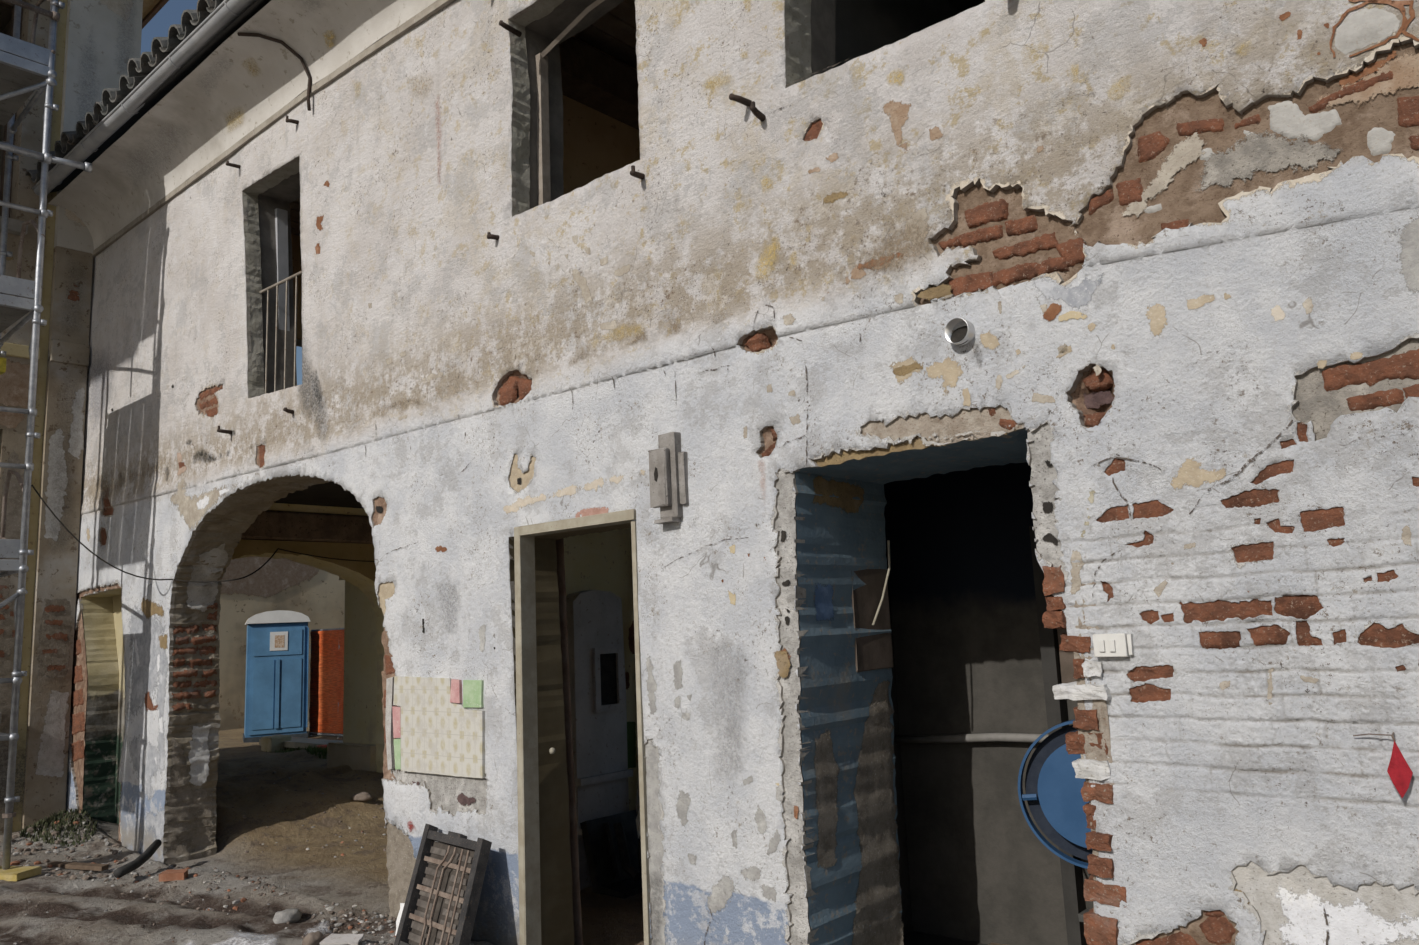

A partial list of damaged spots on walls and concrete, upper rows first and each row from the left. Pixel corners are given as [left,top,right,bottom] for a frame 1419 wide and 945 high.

peeling [1279,11,1302,40]
flaking render [804,119,824,142]
flaking render [882,100,911,153]
flaking render [894,29,1419,331]
flaking render [492,355,532,408]
flaking render [741,313,796,355]
flaking render [44,388,86,541]
flaking render [36,580,123,813]
peeling [118,543,319,865]
peeling [706,414,904,945]
flaking render [811,330,1419,945]
peeling [676,791,691,826]